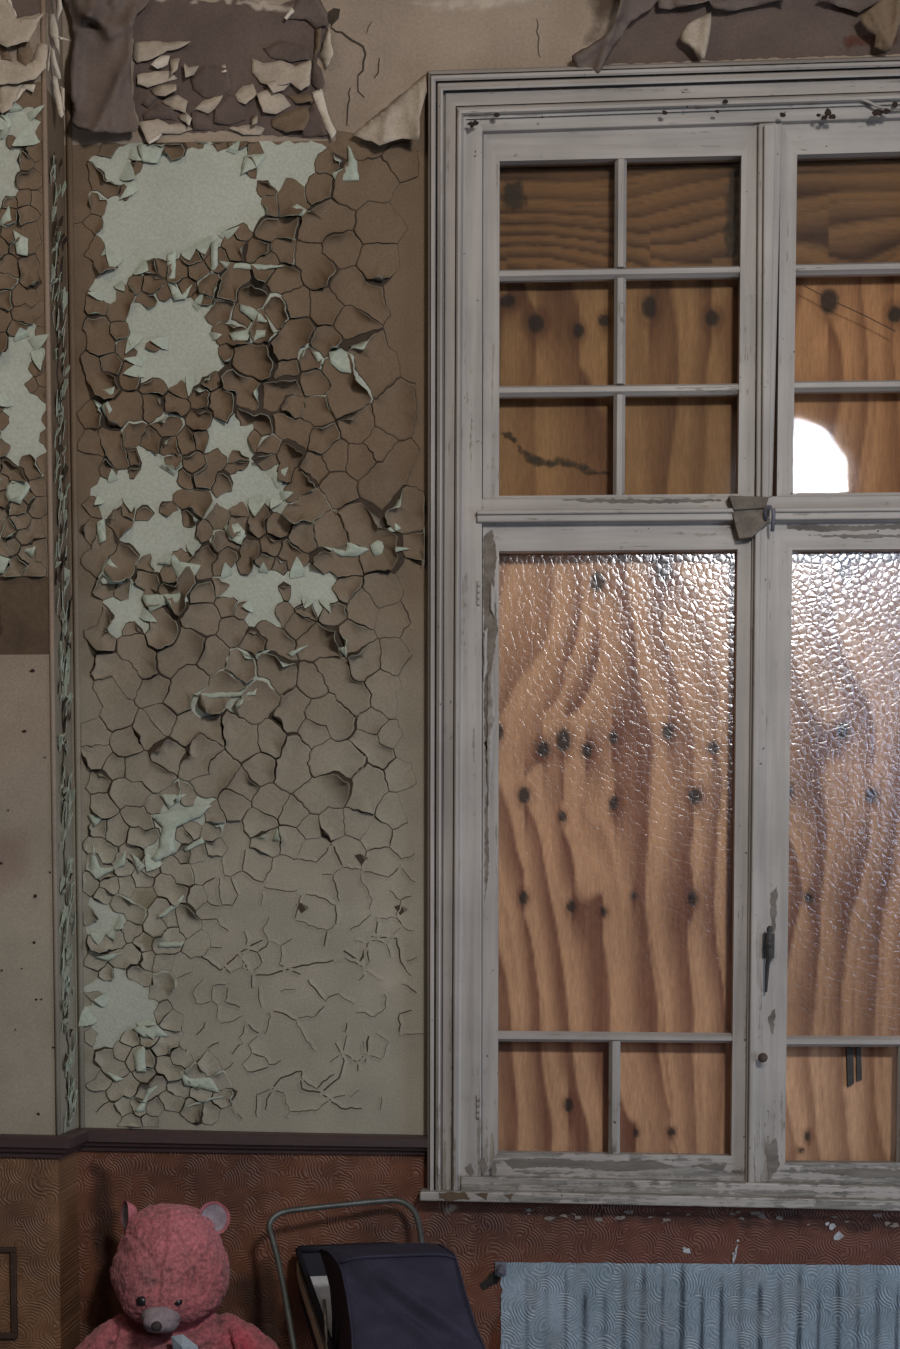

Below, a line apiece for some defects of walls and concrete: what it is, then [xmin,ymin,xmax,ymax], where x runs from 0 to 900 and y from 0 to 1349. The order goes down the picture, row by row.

peeling [604,0,900,65]
peeling [0,0,428,1133]
crack [161,823,424,1121]